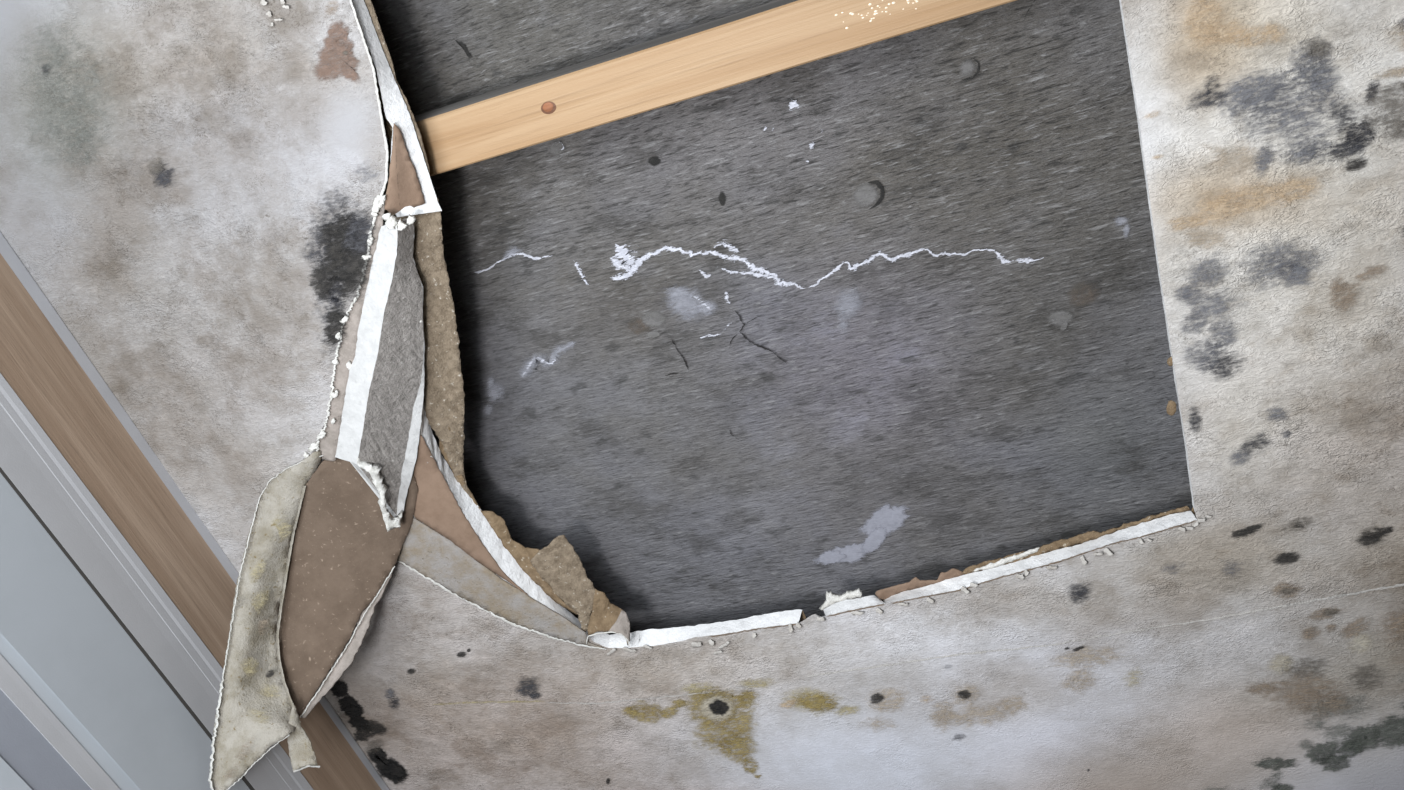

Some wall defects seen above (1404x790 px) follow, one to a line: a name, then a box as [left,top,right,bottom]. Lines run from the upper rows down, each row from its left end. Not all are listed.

water stain [1173,1,1404,377]
water stain [304,190,373,345]
crack [475,242,1044,376]
peeling [397,518,652,656]
water stain [1273,584,1297,597]
water stain [1304,609,1367,639]
water stain [325,667,407,784]
water stain [518,680,540,699]
water stain [624,680,766,778]
water stain [782,690,903,727]
water stain [924,687,1024,740]
water stain [1248,661,1404,790]